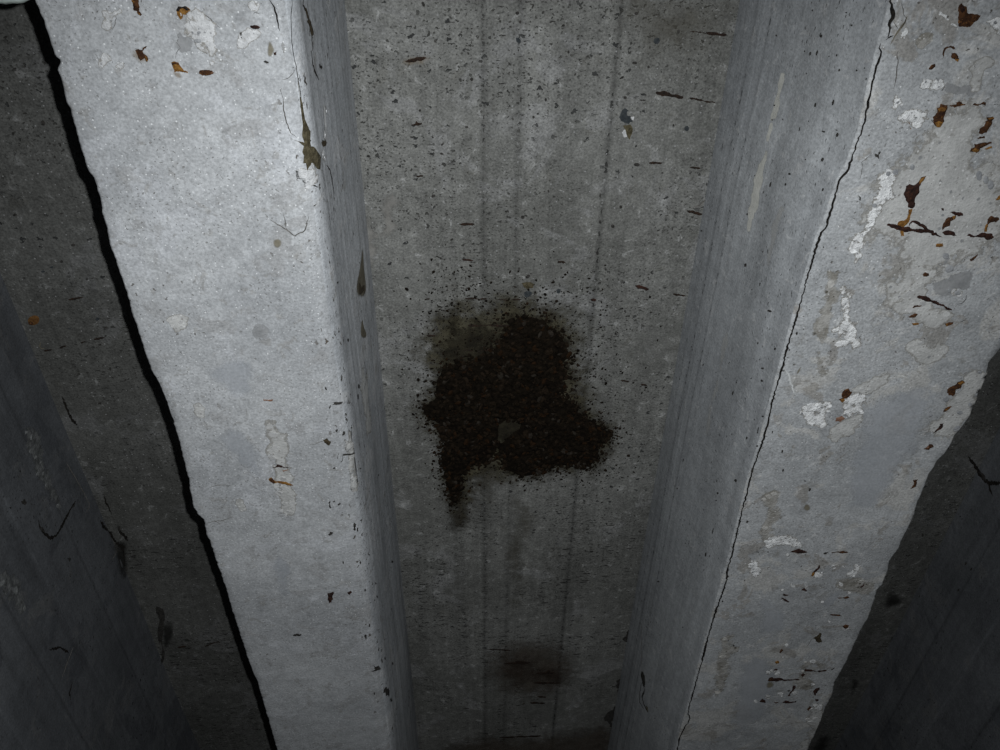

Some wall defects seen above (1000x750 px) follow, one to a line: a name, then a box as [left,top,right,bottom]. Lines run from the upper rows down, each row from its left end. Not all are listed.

rust [176,6,190,20]
rust [958,3,981,27]
rust [171,61,214,76]
spalling [295,97,327,189]
rust [933,101,996,153]
rust [897,176,926,236]
rust [936,208,999,247]
water stain [420,295,612,467]
crack [677,0,907,750]
crack [62,397,77,425]
crack [38,501,76,540]
crack [100,496,128,572]